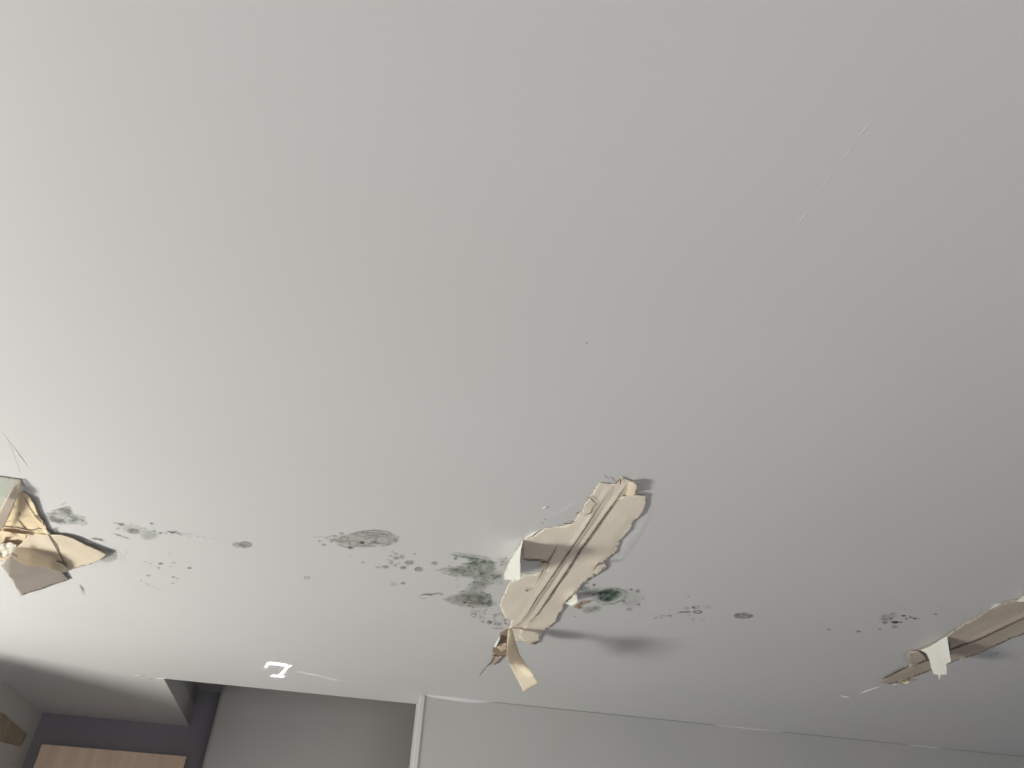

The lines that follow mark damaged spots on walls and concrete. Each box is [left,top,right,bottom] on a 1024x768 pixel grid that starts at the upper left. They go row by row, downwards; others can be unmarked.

spalling [0,542,17,558]
spalling [492,629,508,657]